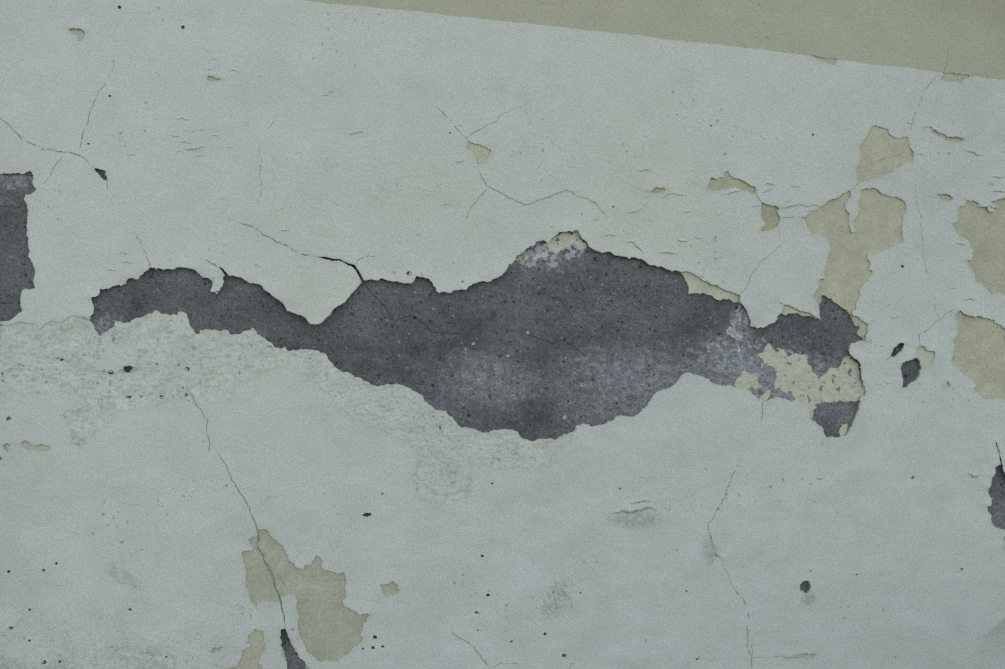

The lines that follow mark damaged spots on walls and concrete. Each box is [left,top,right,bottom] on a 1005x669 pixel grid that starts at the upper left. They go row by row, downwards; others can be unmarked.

peeling [69,28,84,42]
crack [1,61,114,184]
peeling [925,125,982,155]
crack [238,222,453,334]
spalling [0,125,923,504]
spalling [891,343,935,387]
peeling [938,174,1005,295]
peeling [952,295,1005,400]
crack [190,393,285,623]
spalling [988,457,1005,540]
peeling [229,629,266,669]
peeling [242,529,384,669]